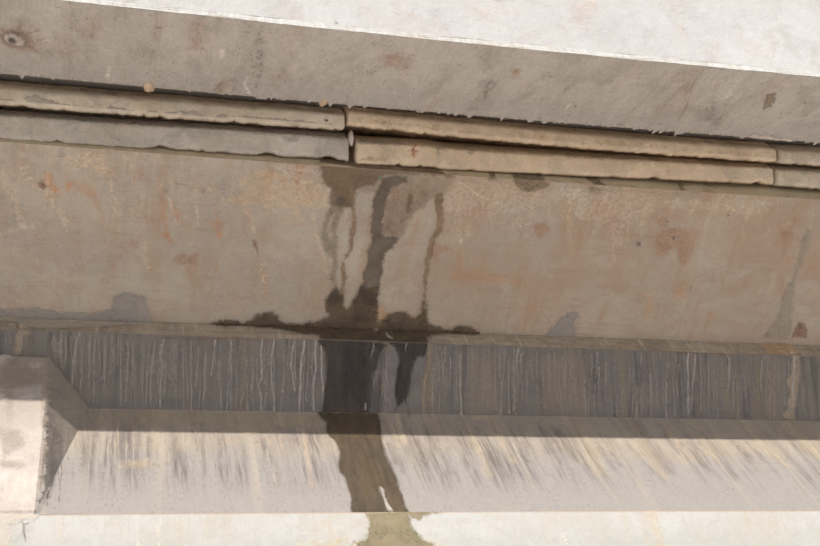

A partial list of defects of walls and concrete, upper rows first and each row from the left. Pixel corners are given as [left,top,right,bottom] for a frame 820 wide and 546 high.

damp [723,167,775,181]
damp [51,155,753,546]
damp [760,343,820,454]